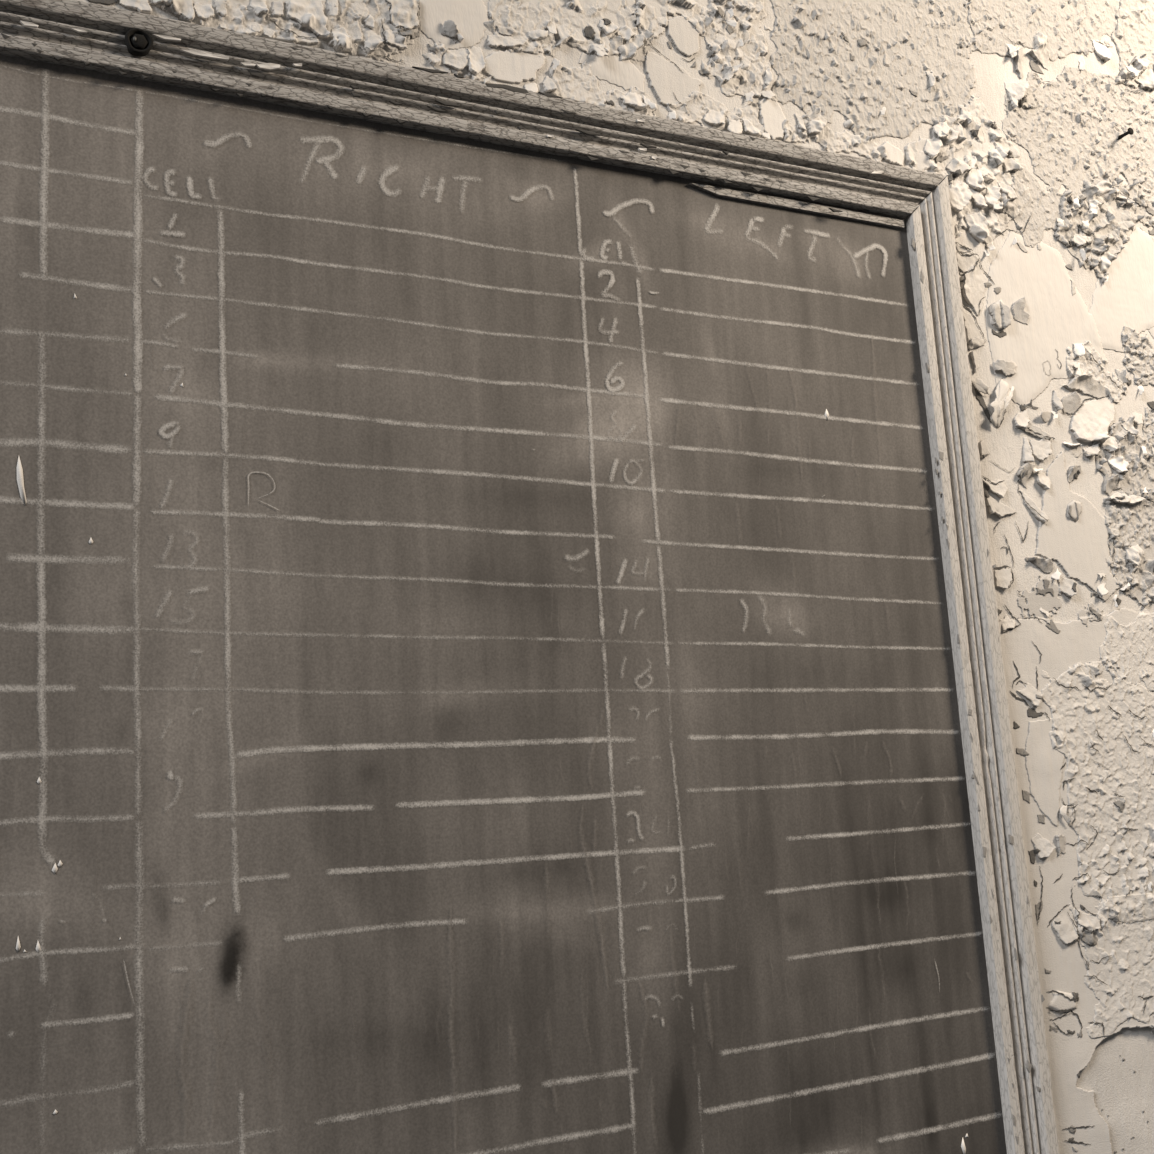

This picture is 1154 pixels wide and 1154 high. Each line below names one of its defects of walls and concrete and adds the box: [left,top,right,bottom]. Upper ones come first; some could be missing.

peeling [152,34,302,70]
peeling [119,0,419,63]
flaking render [423,0,1154,1154]